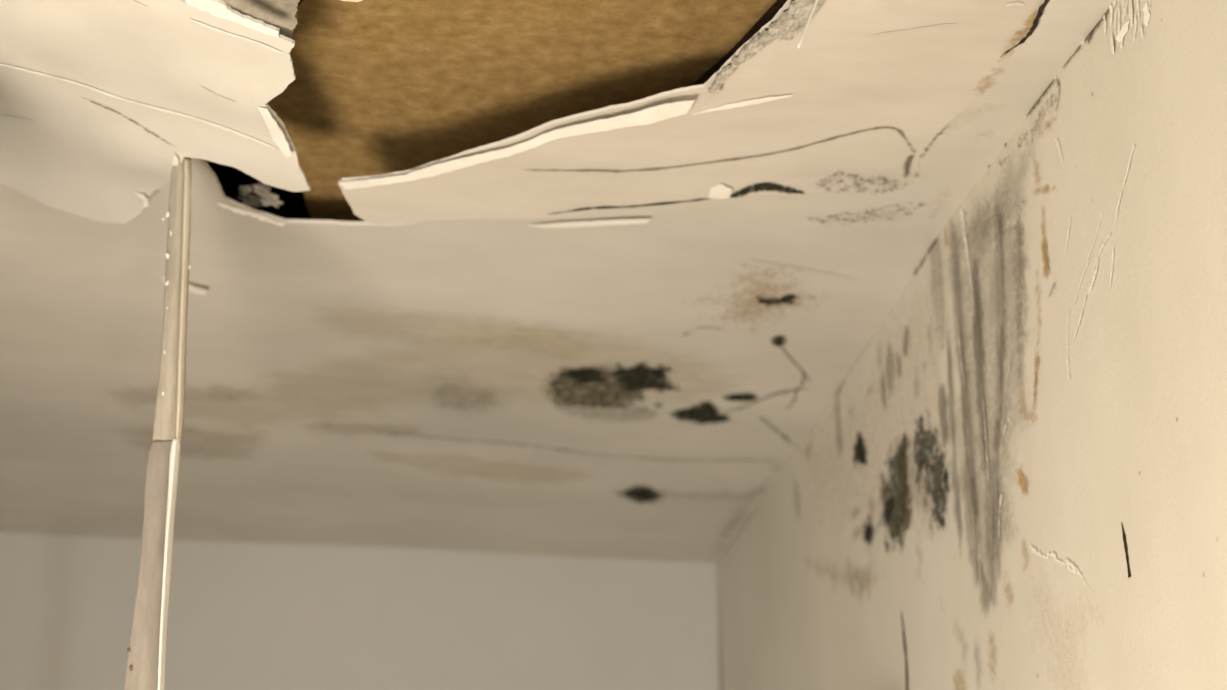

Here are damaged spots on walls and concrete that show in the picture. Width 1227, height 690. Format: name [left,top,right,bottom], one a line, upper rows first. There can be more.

crack [1001,0,1049,57]
peeling [1080,0,1150,54]
crack [1029,8,1110,114]
spalling [528,183,804,228]
crack [915,240,937,273]
mould [549,361,792,425]
crack [761,374,845,449]
mould [620,486,667,503]
mould [863,410,949,552]